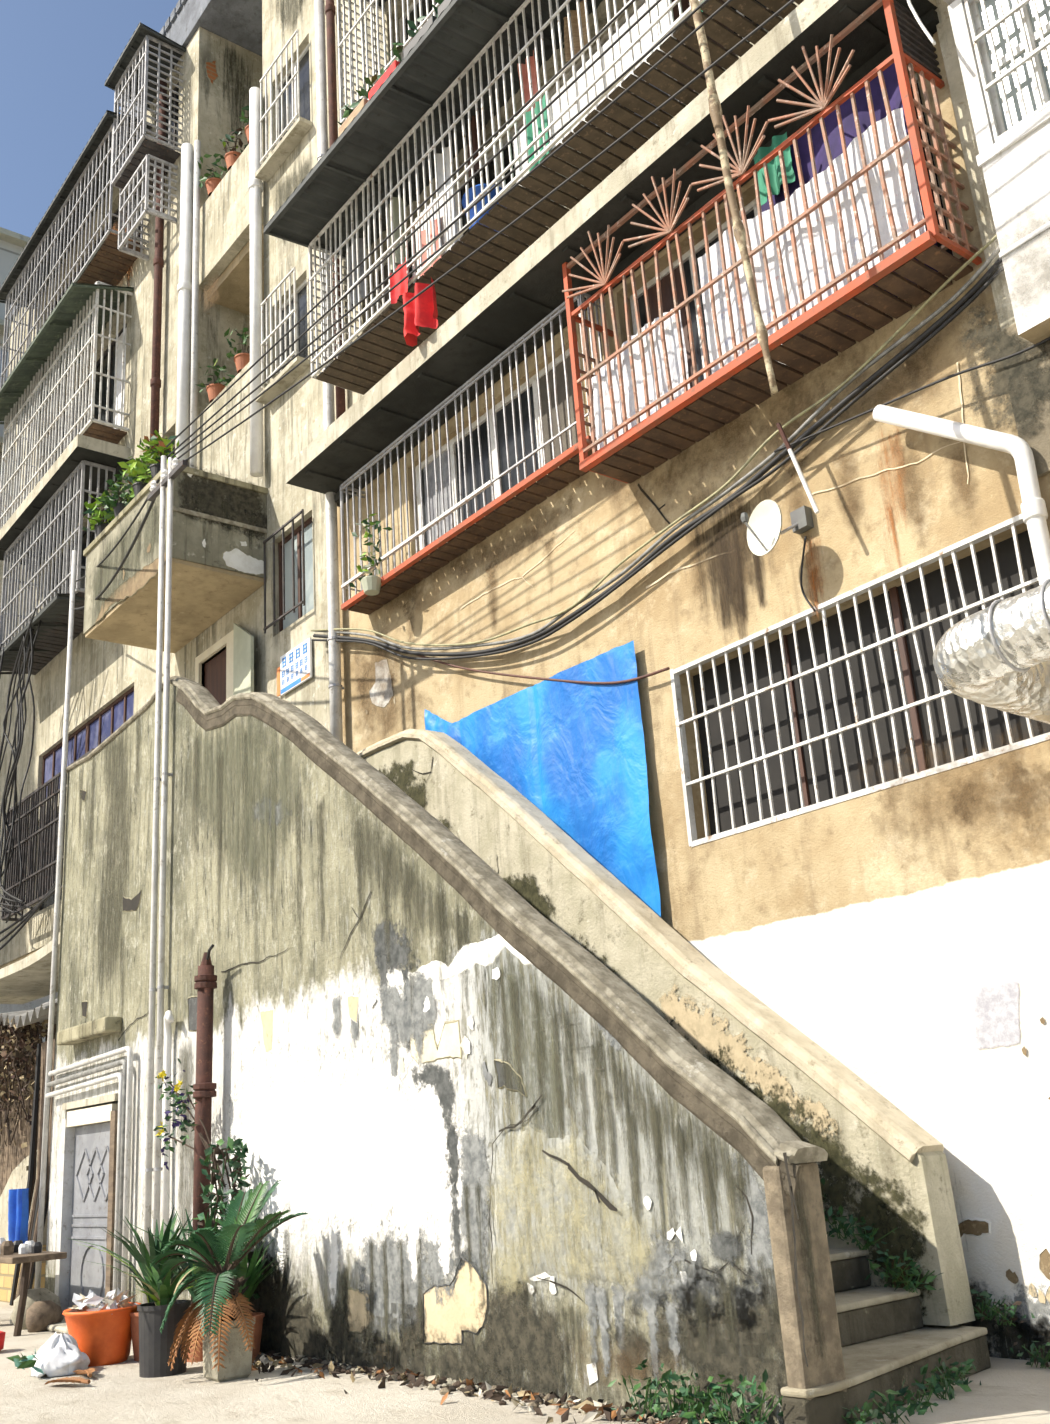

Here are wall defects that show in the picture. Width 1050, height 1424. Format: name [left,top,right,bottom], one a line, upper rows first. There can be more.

damp [963,306,1050,436]
flaking render [221,541,264,576]
crack [638,483,670,524]
damp [696,497,763,635]
damp [180,715,324,939]
peeling [347,934,533,1098]
damp [247,809,788,1414]
crack [499,1095,542,1132]
crack [542,1150,617,1212]
peeling [344,1220,489,1356]
mould [958,1282,1050,1362]
spalling [1006,1247,1050,1304]